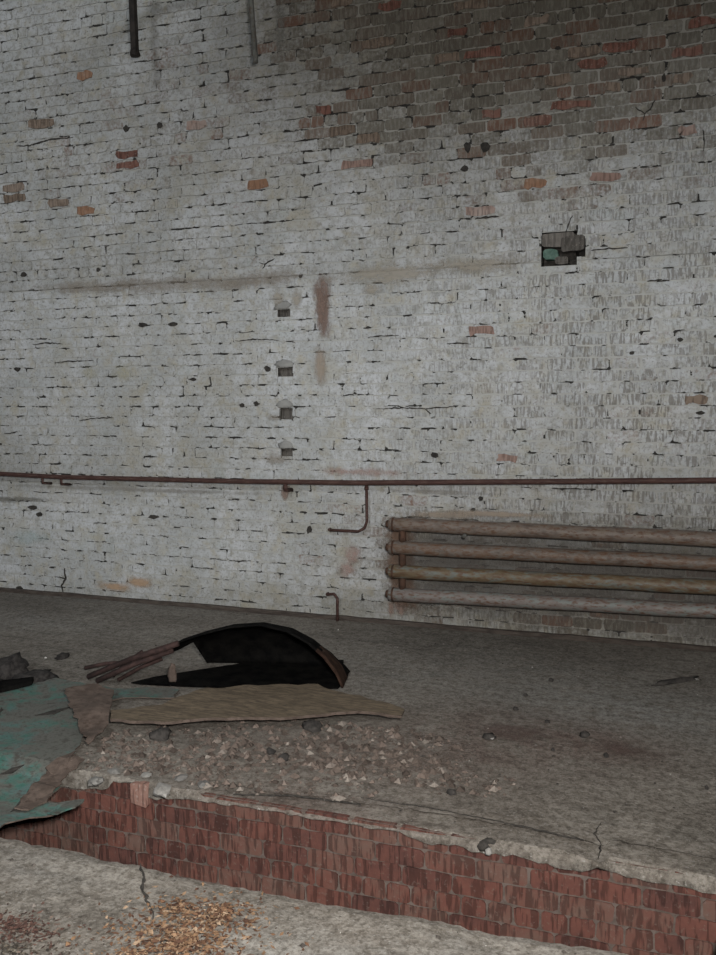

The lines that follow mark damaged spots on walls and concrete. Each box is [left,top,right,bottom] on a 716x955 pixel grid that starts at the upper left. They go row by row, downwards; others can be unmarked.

peeling [555,39,638,69]
peeling [523,100,591,126]
peeling [329,125,380,144]
spalling [464,142,490,153]
flaking render [115,150,139,169]
peeling [341,159,373,170]
flaking render [589,172,622,182]
flaking render [3,182,26,203]
flaking render [47,199,95,216]
corrosion [315,279,328,335]
spalling [0,781,716,955]
crack [139,863,155,923]